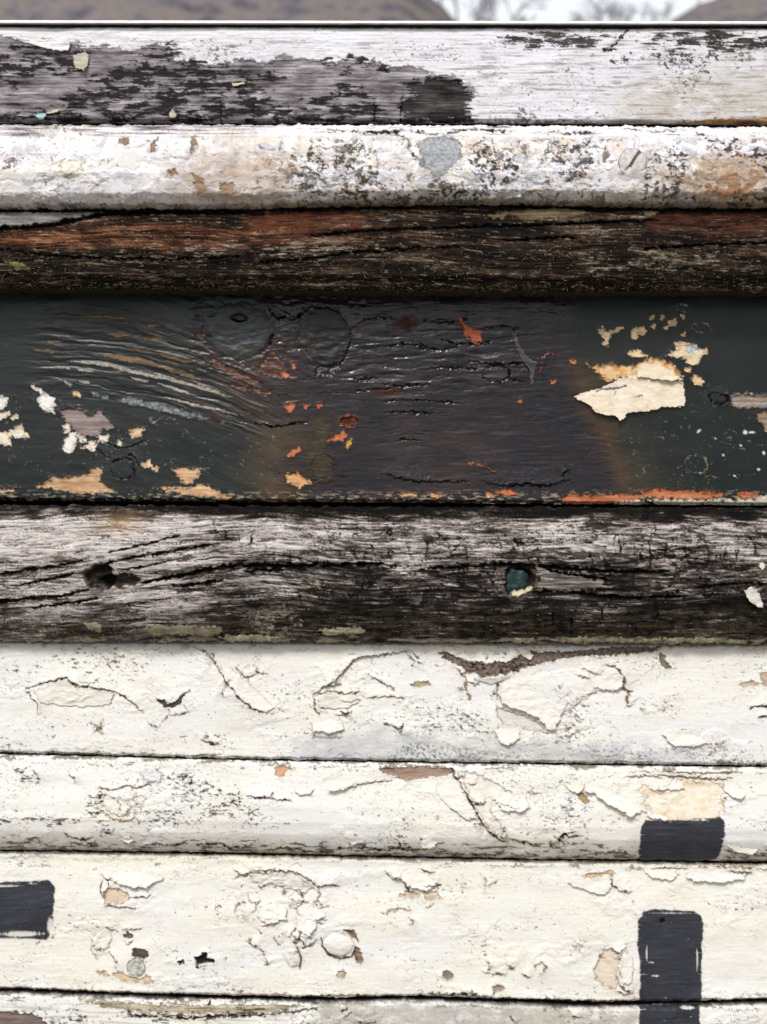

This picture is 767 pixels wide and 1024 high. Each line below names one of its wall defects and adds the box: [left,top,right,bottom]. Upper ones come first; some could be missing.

peeling [0,35,478,123]
peeling [569,314,708,421]
peeling [0,395,30,446]
peeling [31,385,209,453]
peeling [37,467,114,494]
crack [27,677,187,727]
crack [202,650,278,714]
crack [314,651,418,717]
crack [459,670,499,700]
crack [606,665,631,703]
crack [451,768,626,886]
peeling [564,776,746,821]